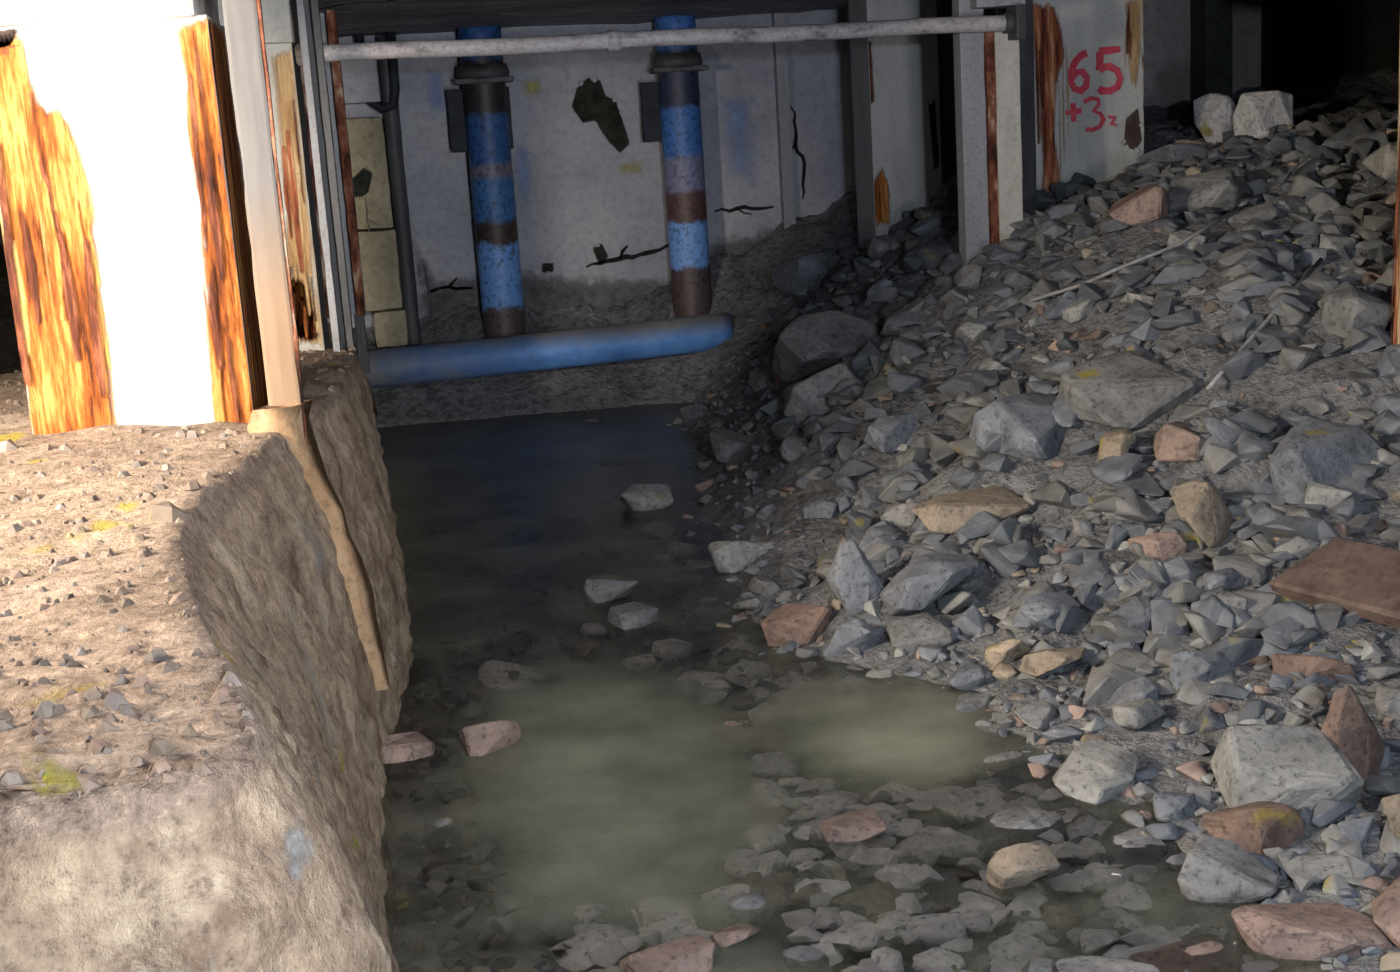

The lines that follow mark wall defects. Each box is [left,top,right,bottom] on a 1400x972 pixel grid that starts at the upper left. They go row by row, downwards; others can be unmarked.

corrosion [0,33,116,435]
corrosion [177,0,268,423]
corrosion [256,0,323,445]
spalling [353,167,372,201]
spalling [572,75,629,152]
crack [714,105,806,215]
corrosion [874,169,890,225]
corrosion [1033,3,1069,192]
corrosion [1125,0,1143,84]
corrosion [1391,41,1400,344]